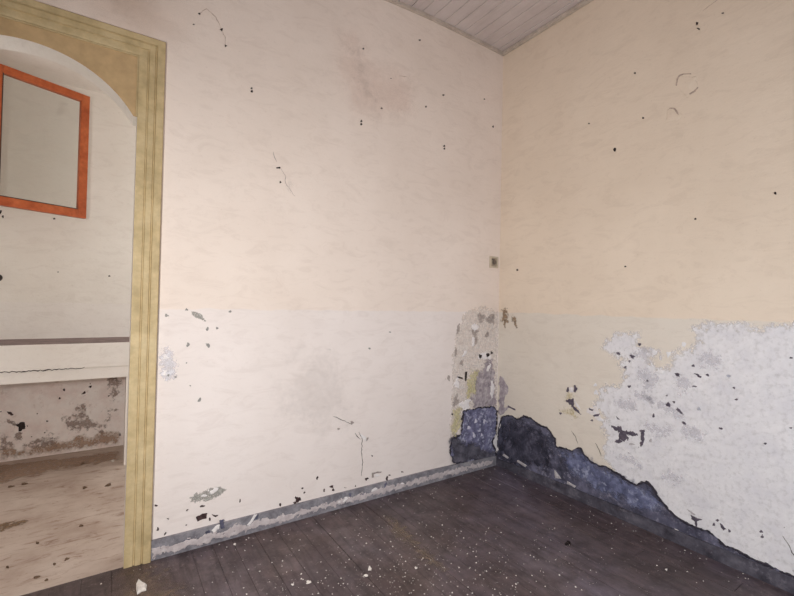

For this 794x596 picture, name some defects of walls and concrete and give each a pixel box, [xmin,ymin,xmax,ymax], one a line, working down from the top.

leakage [1,405,119,457]
peeling [151,306,794,578]